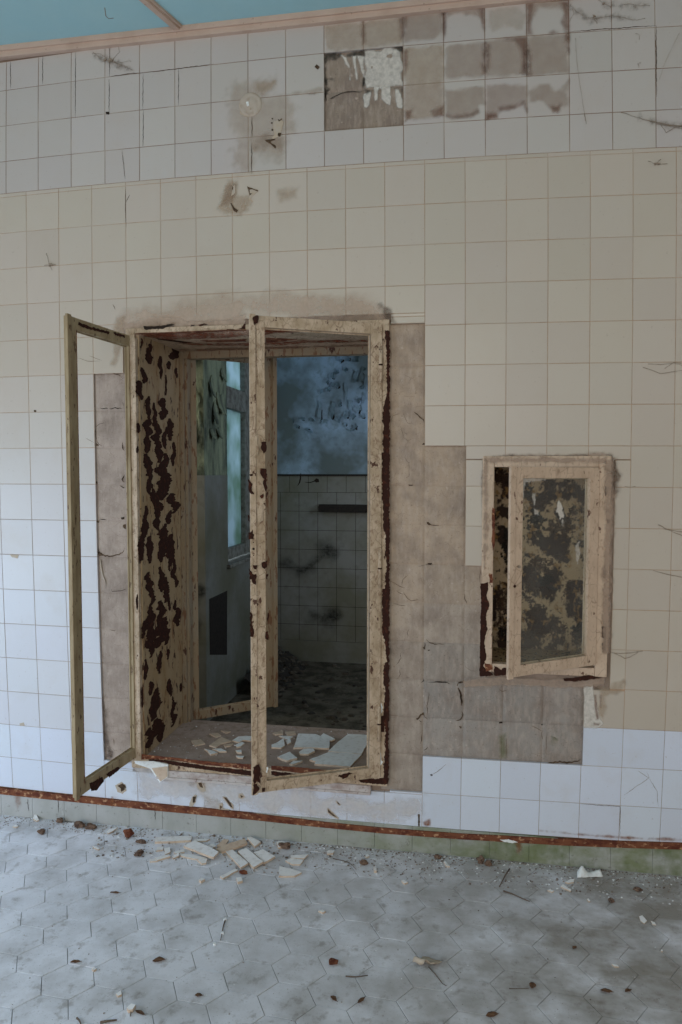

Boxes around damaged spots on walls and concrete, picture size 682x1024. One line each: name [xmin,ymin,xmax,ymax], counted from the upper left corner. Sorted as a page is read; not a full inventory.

peeling [325,48,404,131]
peeling [95,338,182,760]
corrosion [338,330,391,785]
peeling [381,323,584,792]